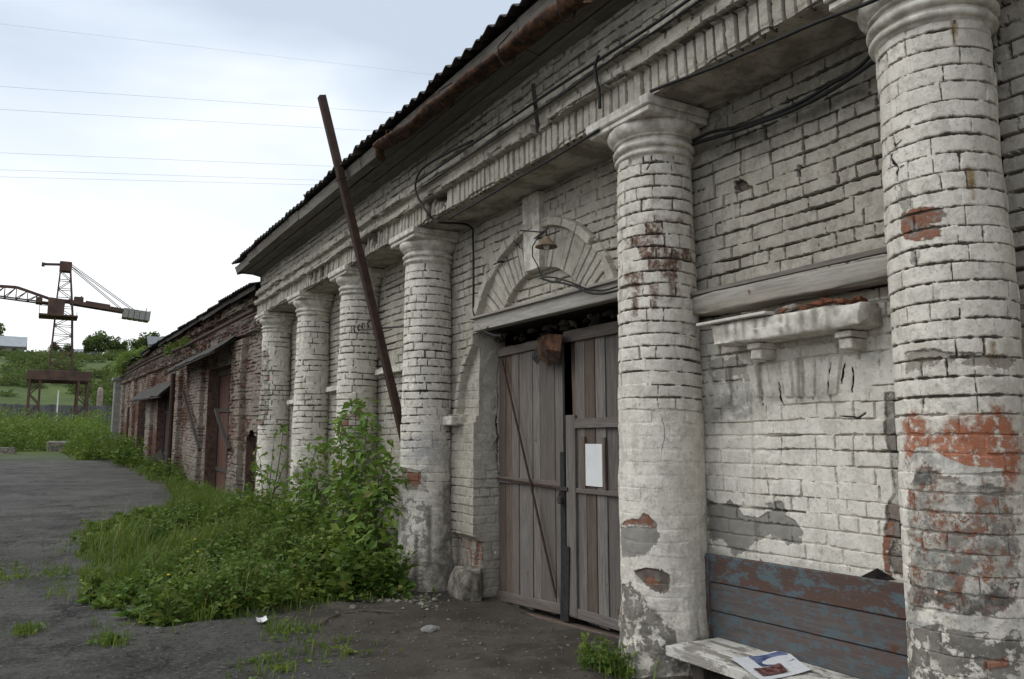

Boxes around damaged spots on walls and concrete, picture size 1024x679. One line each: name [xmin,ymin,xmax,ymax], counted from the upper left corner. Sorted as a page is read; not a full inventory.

flaking render [898,179,947,265]
crack [827,364,867,420]
peeling [400,468,430,592]
peeling [619,513,690,678]
peeling [706,499,803,557]
spalling [861,392,1024,679]